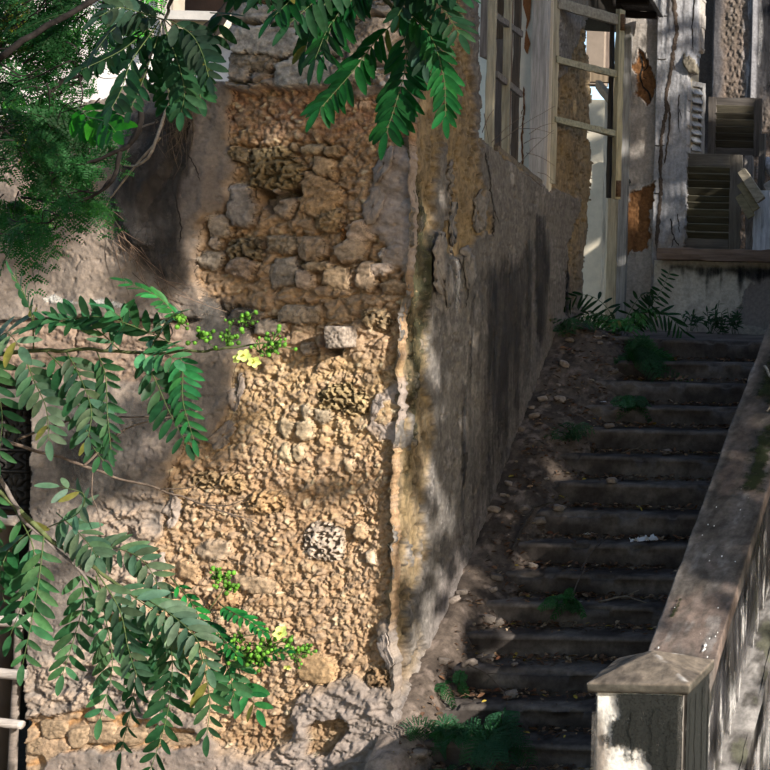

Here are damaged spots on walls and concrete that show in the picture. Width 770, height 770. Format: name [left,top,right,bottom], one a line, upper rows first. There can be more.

spalling [523,0,531,54]
spalling [632,47,656,106]
crack [639,0,695,256]
spalling [627,179,656,258]
leakage [670,266,770,288]
leakage [482,216,549,495]
spalling [144,81,418,757]
leakage [591,504,770,770]
spalling [24,708,201,770]